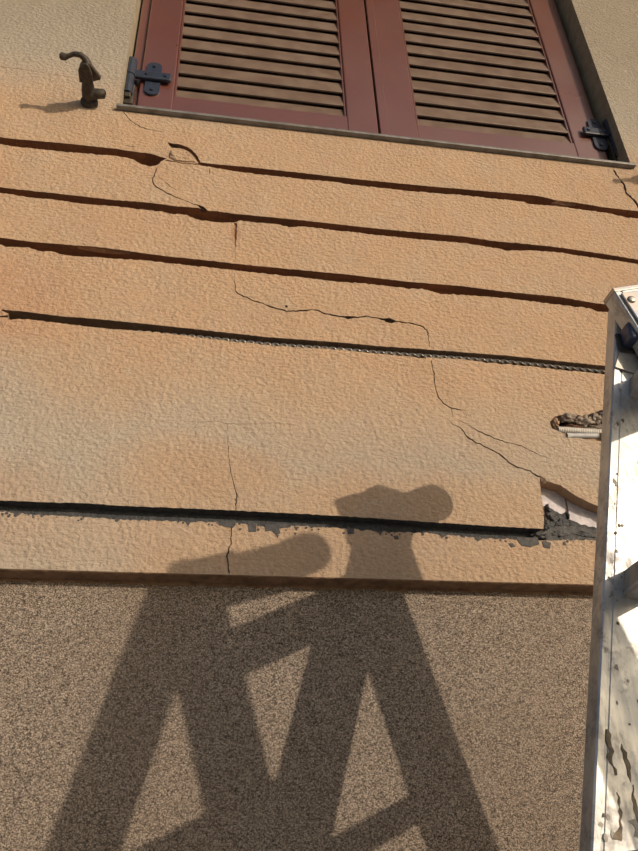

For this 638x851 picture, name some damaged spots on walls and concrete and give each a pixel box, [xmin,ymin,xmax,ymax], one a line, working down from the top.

crack [152,168,207,212]
crack [613,170,638,208]
crack [231,223,239,258]
crack [234,279,549,477]
crack [187,421,238,573]
spalling [529,475,598,541]